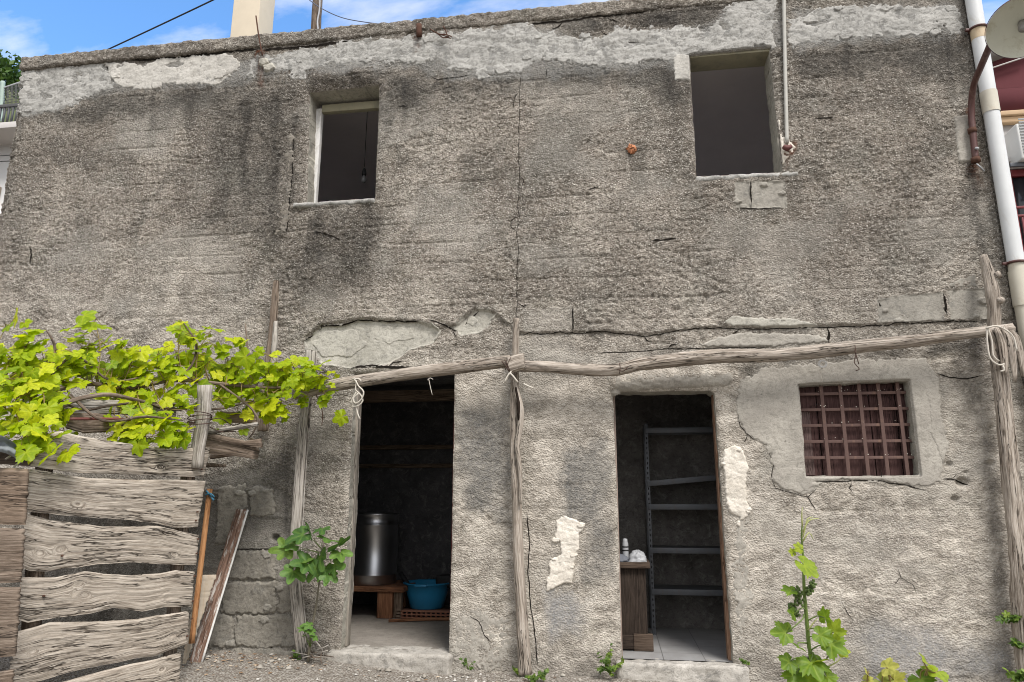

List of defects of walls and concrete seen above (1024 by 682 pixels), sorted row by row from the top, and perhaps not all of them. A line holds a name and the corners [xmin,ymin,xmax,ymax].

peeling [16,0,966,118]
crack [511,77,980,353]
spalling [304,307,495,369]
crack [738,417,968,510]
crack [527,517,538,664]